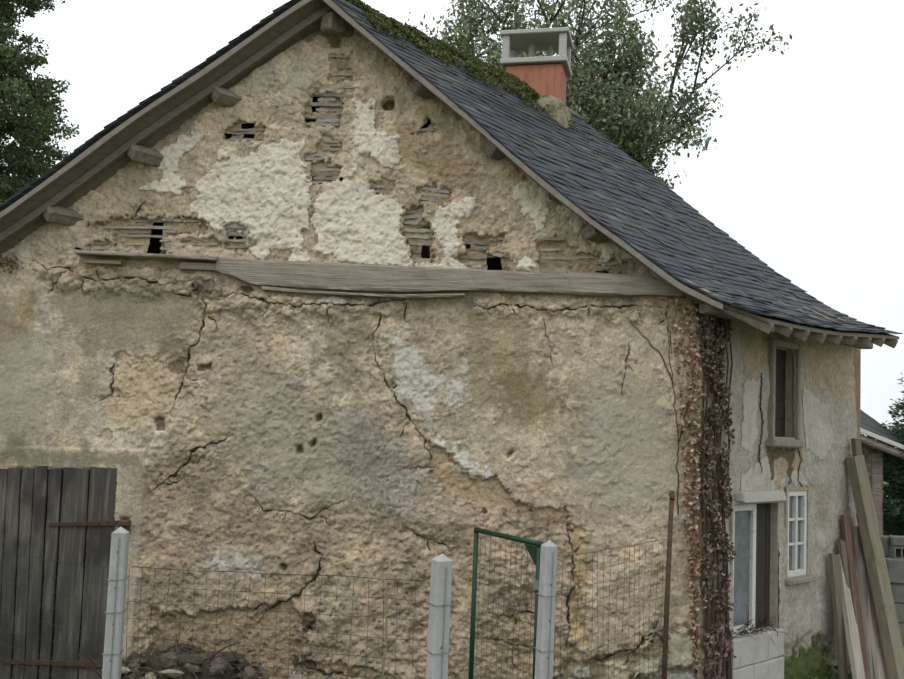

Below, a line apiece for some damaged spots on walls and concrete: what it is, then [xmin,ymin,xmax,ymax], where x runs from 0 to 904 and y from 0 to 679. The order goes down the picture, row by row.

flaking render [138,98,477,268]
flaking render [516,256,536,272]
flaking render [508,178,586,234]
flaking render [589,241,633,266]
crack [148,433,234,495]
crack [32,259,433,470]
damp [225,322,493,524]
flaking render [740,323,833,492]
damp [194,547,265,585]
crack [243,493,343,624]
crack [561,525,585,653]
crack [588,621,663,666]